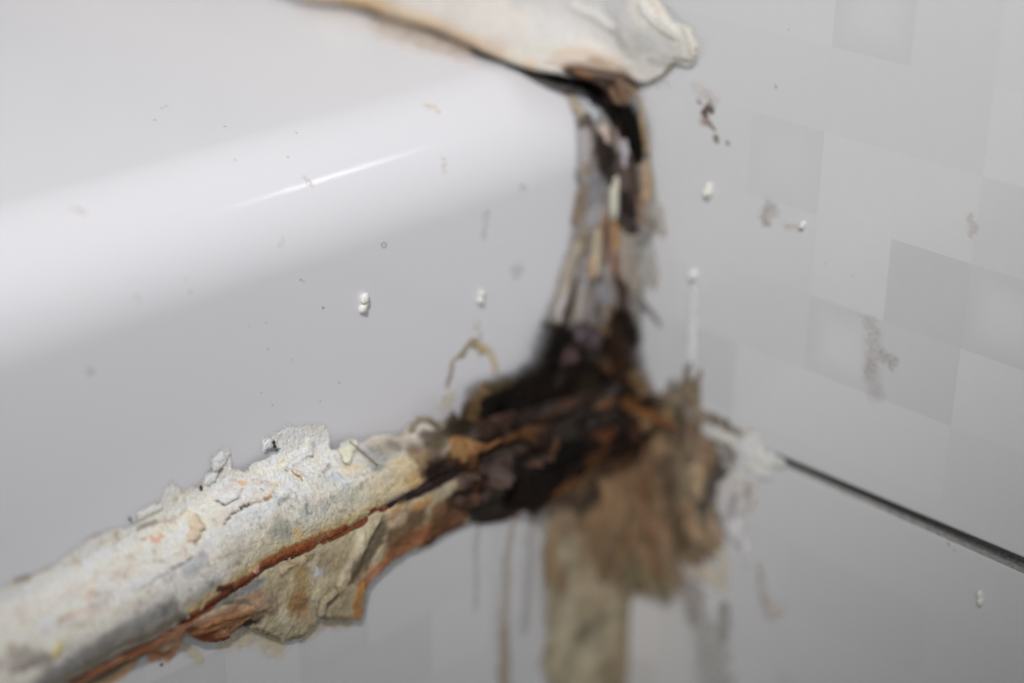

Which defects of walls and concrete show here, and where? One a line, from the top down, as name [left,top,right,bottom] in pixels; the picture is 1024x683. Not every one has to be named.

water stain [697,98,730,145]
peeling [262,437,274,451]
peeling [338,439,359,464]
water stain [442,309,743,683]
peeling [317,581,367,621]
corrosion [94,660,137,683]